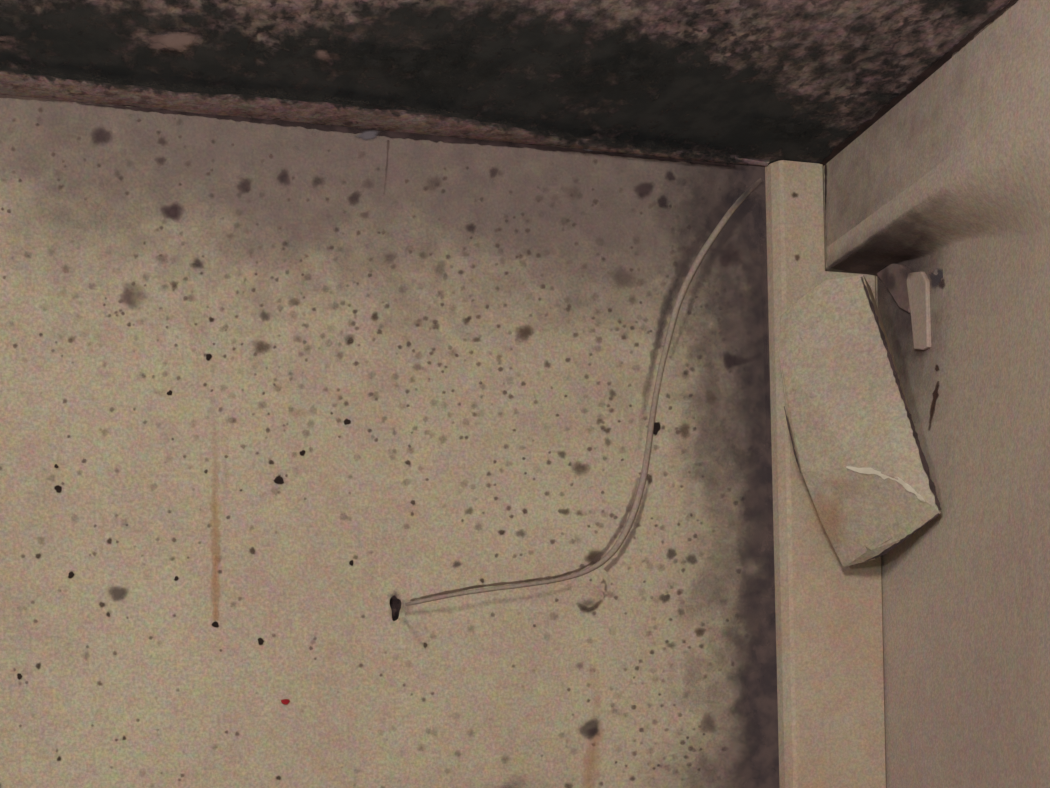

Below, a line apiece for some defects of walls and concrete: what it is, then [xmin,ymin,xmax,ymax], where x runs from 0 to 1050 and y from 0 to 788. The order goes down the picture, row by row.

leakage [160,205,180,229]